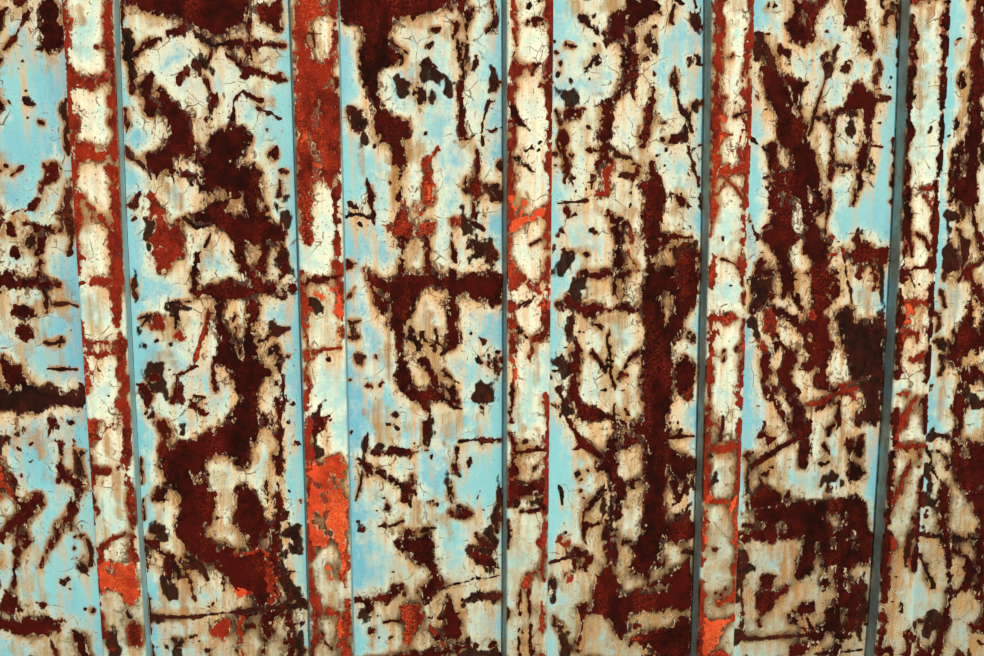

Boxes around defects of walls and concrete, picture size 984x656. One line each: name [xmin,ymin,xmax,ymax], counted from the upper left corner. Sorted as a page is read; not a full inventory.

peeling [525,0,544,27]
peeling [538,39,577,89]
peeling [510,104,531,137]
peeling [513,140,558,173]
peeling [308,286,355,320]
peeling [510,269,561,312]
corrosion [0,0,727,656]
peeling [355,353,377,367]
peeling [515,324,549,362]
peeling [512,464,547,514]
peeling [885,491,939,656]
peeling [97,560,143,656]